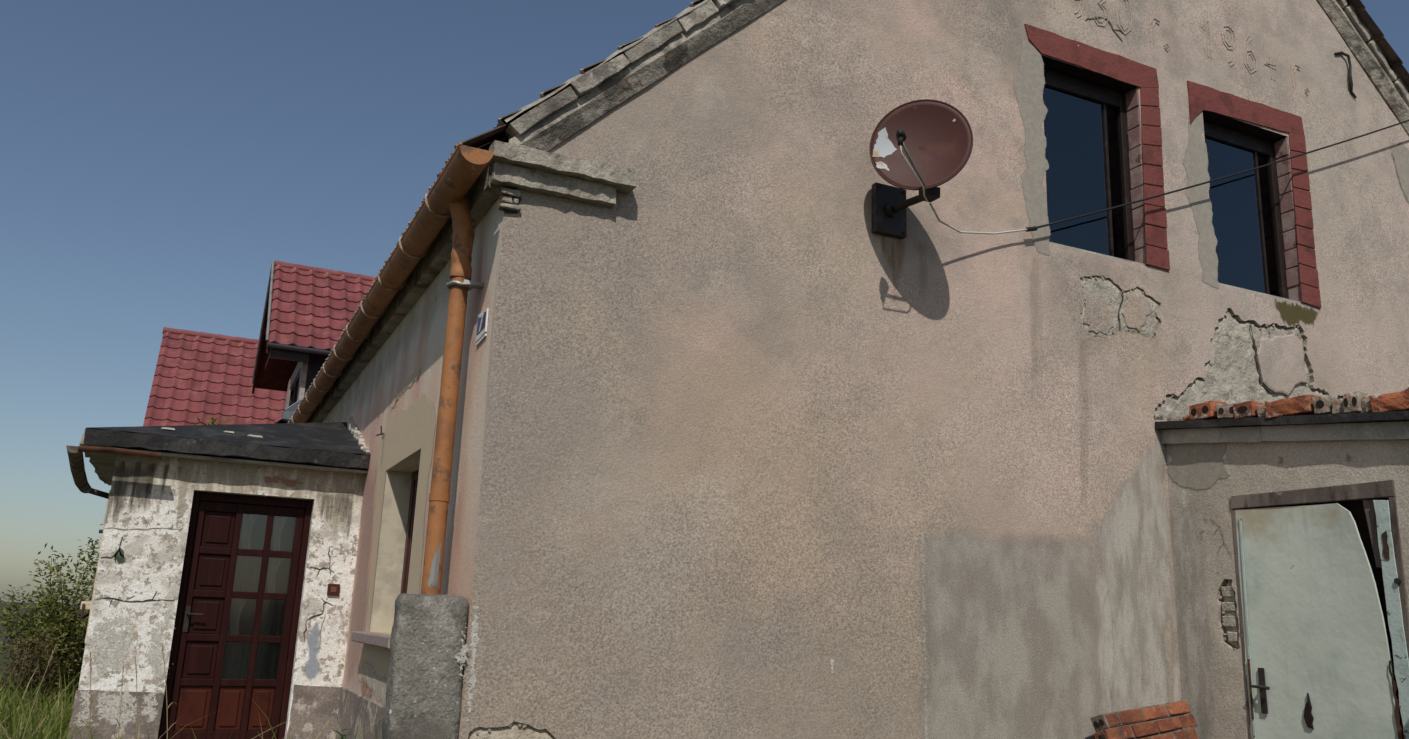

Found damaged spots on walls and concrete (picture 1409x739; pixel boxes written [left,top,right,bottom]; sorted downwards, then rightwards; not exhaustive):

spalling [1080,275,1161,340]
spalling [1153,308,1343,421]
spalling [265,476,302,487]
peeling [71,608,175,729]
spalling [466,602,556,739]
spalling [1217,579,1240,651]